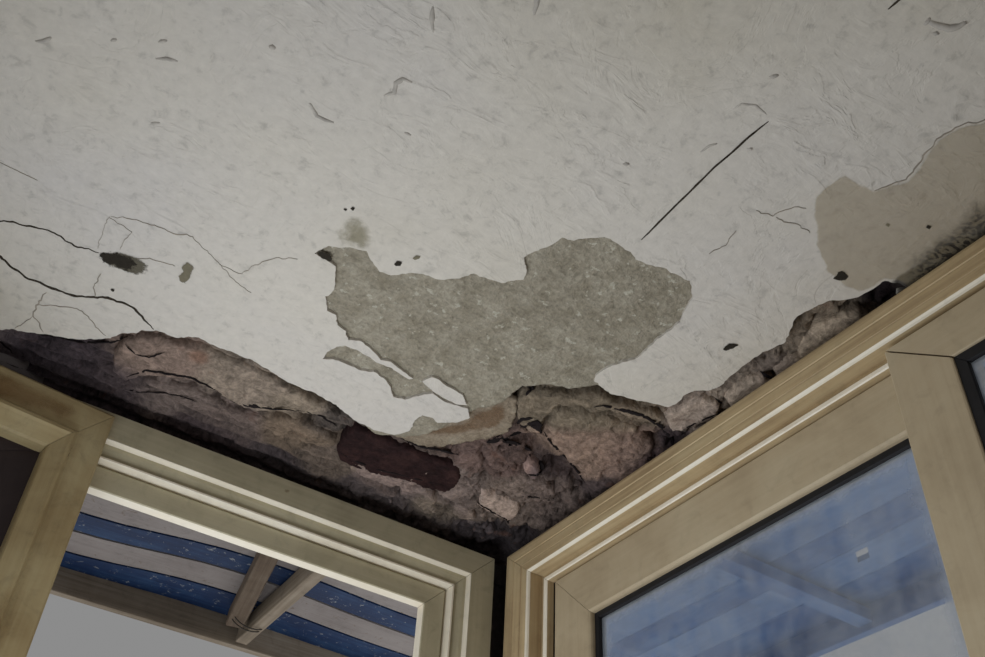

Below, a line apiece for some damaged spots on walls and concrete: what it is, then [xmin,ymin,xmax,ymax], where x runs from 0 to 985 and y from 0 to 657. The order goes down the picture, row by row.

crack [0,216,298,336]
damp [895,214,985,293]
spalling [0,237,898,566]